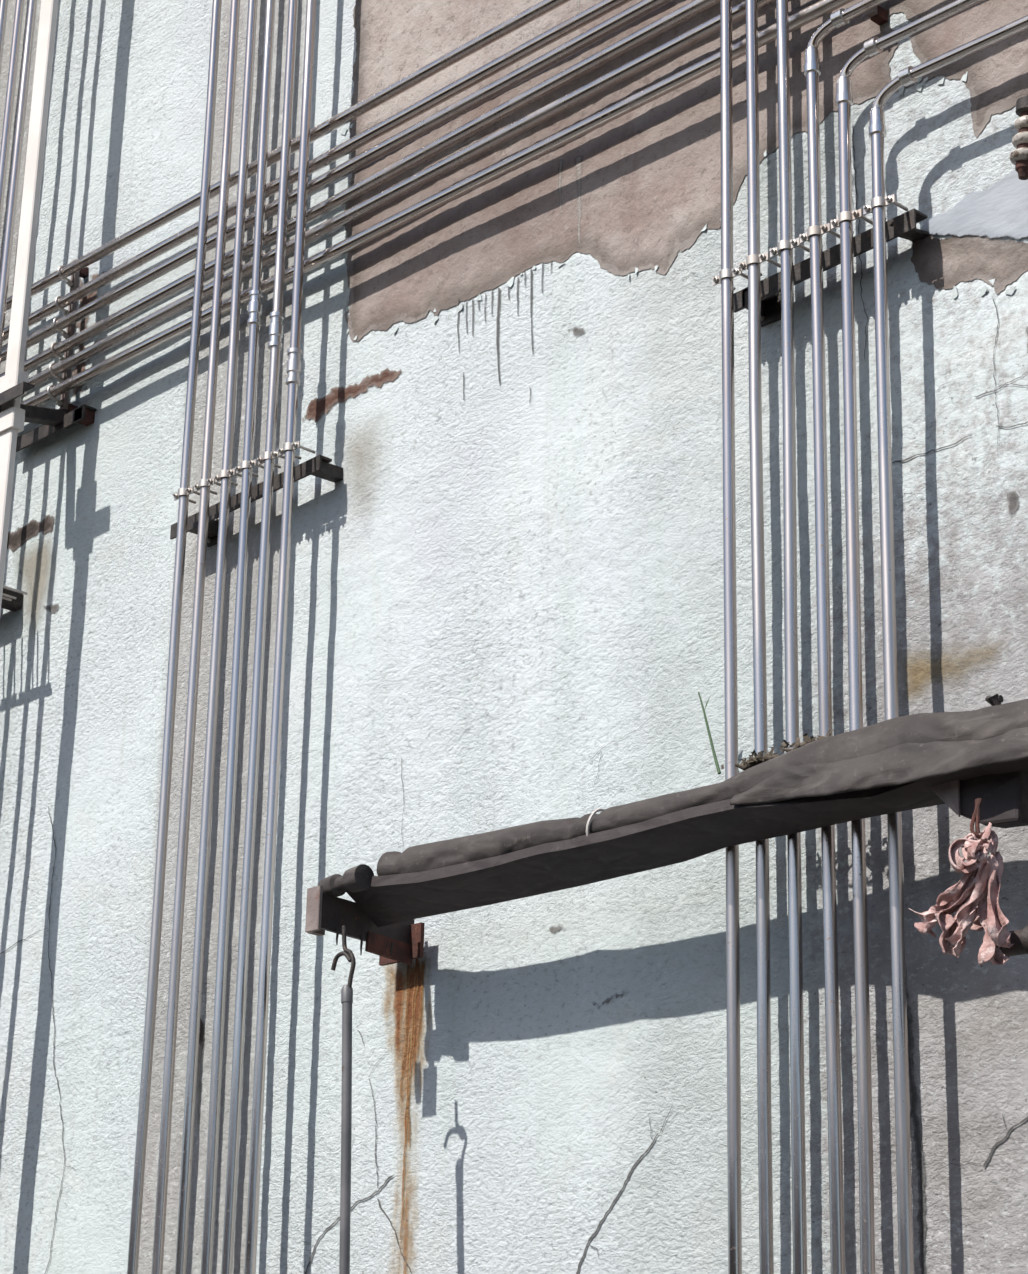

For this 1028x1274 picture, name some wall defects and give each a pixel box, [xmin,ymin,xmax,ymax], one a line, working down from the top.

peeling [341,0,1028,342]
leakage [457,261,552,384]
crack [0,807,87,1273]
crack [305,1030,412,1274]
corrosion [385,959,425,1274]
crack [576,1104,673,1274]
crack [906,988,1028,1274]